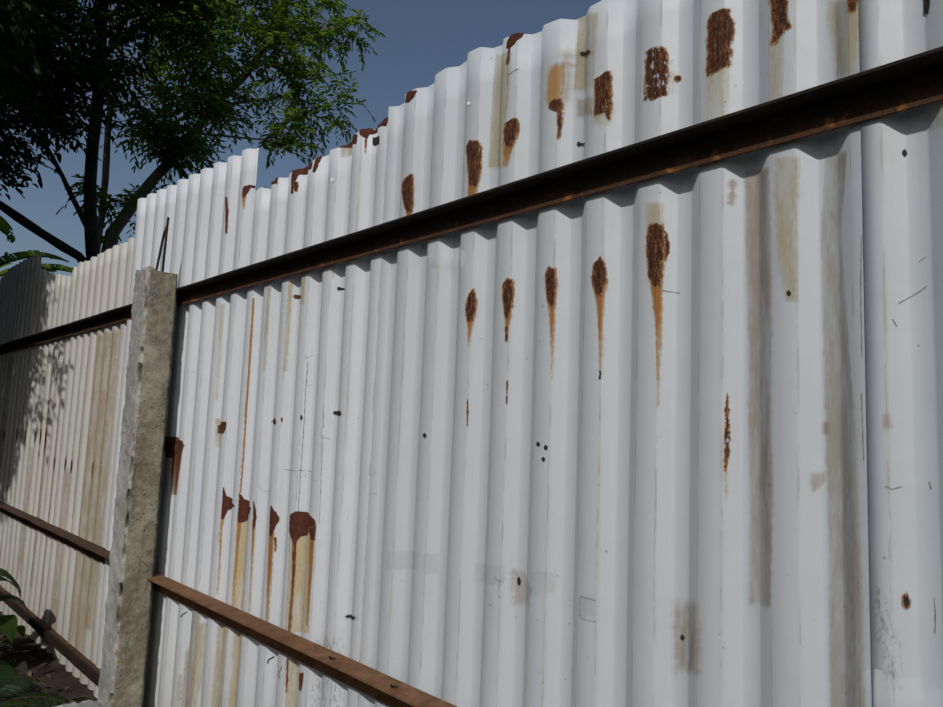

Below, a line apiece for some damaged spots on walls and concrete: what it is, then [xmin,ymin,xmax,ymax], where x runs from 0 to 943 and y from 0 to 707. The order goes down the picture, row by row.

rust [593,71,613,120]
rust [643,46,681,100]
rust [705,8,735,76]
rust [768,0,792,45]
rust [401,174,415,216]
rust [466,139,482,196]
rust [502,278,515,341]
rust [591,256,608,357]
rust [646,223,670,380]
rust [164,437,184,495]
rust [217,298,257,607]
rust [266,506,316,633]